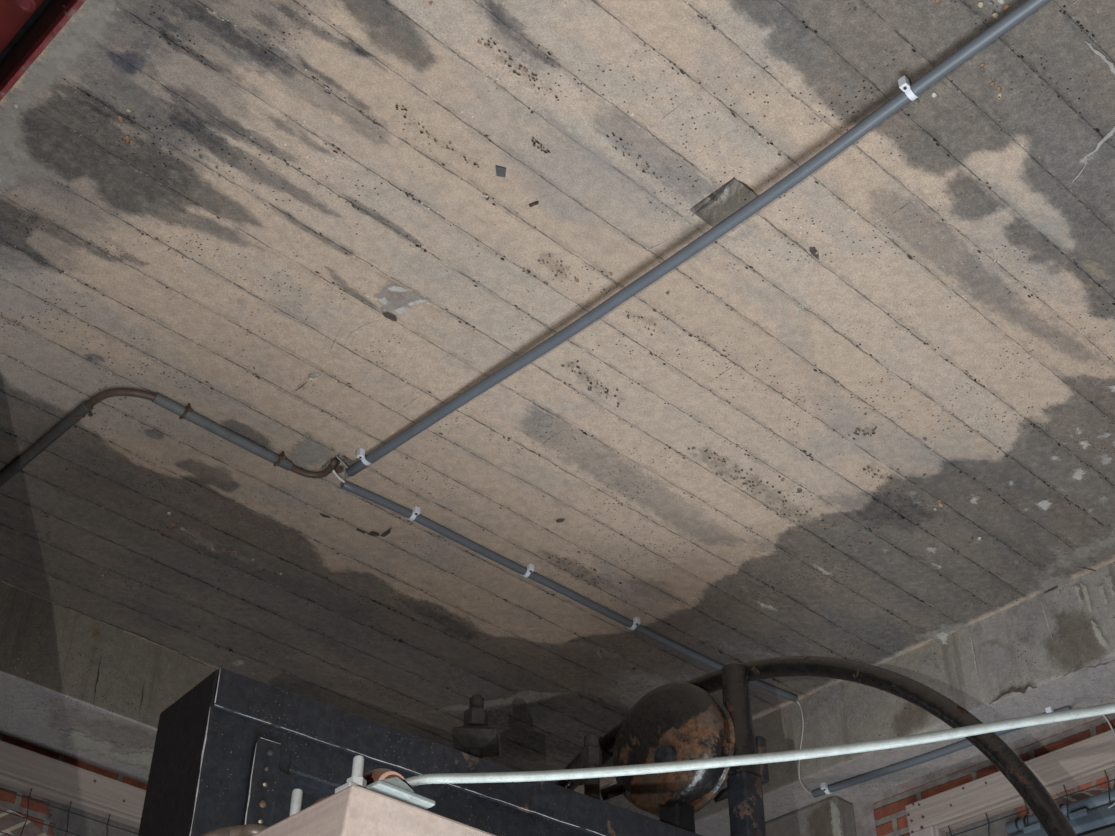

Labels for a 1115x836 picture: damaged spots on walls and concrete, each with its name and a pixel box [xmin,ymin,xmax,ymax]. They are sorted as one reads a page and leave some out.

crack [1085,41,1115,74]
crack [1070,126,1115,186]
spalling [689,177,758,227]
damp [1028,525,1115,649]
damp [917,623,965,644]
damp [484,690,562,708]